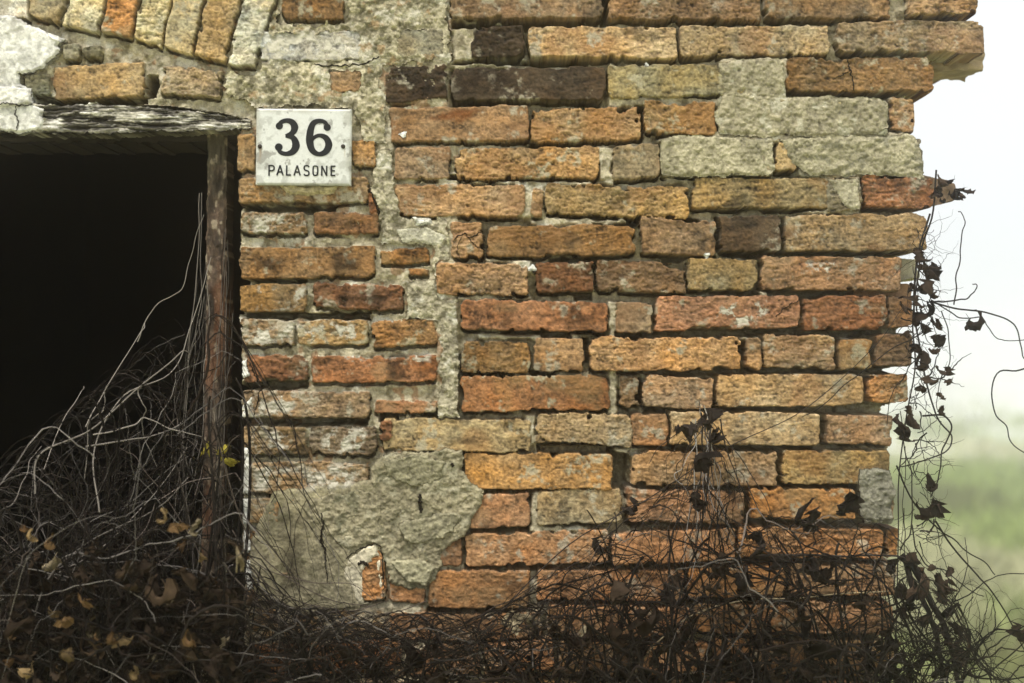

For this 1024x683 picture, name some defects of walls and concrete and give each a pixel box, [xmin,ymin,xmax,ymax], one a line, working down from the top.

flaking render [0,15,68,136]
crack [319,513,328,583]
spalling [302,447,484,605]